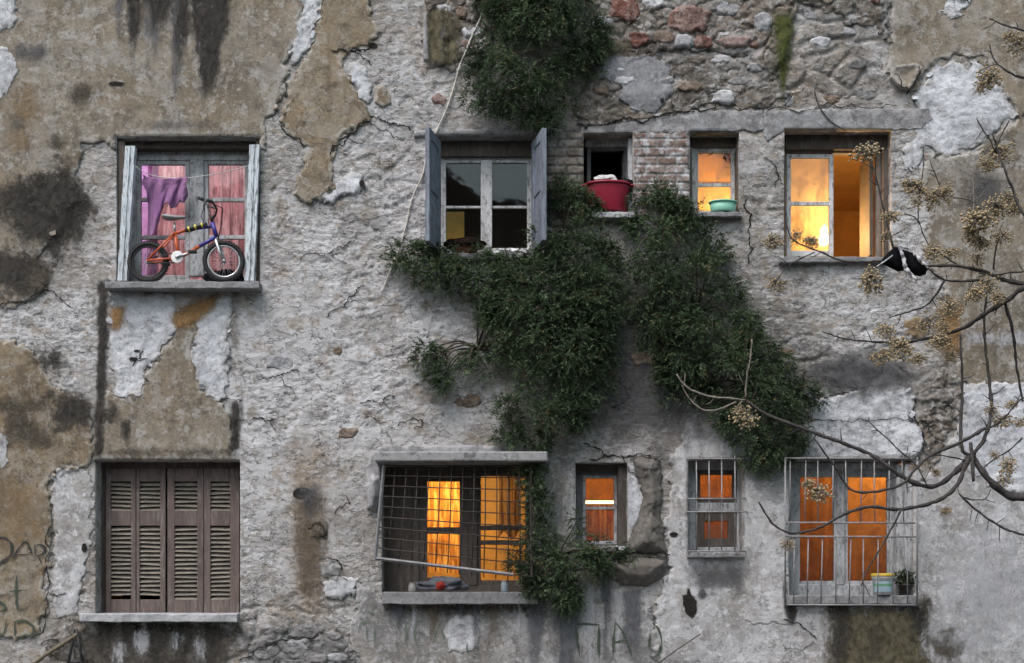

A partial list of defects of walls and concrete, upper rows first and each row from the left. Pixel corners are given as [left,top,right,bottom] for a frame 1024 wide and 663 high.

water stain [115,0,230,91]
water stain [66,84,90,106]
flaking render [0,0,391,263]
water stain [0,134,99,299]
crack [743,199,759,264]
flaking render [0,282,45,311]
flaking render [247,0,1024,663]
flaking render [0,291,240,663]
crack [583,443,661,475]
water stain [294,486,325,596]
water stain [829,606,852,662]